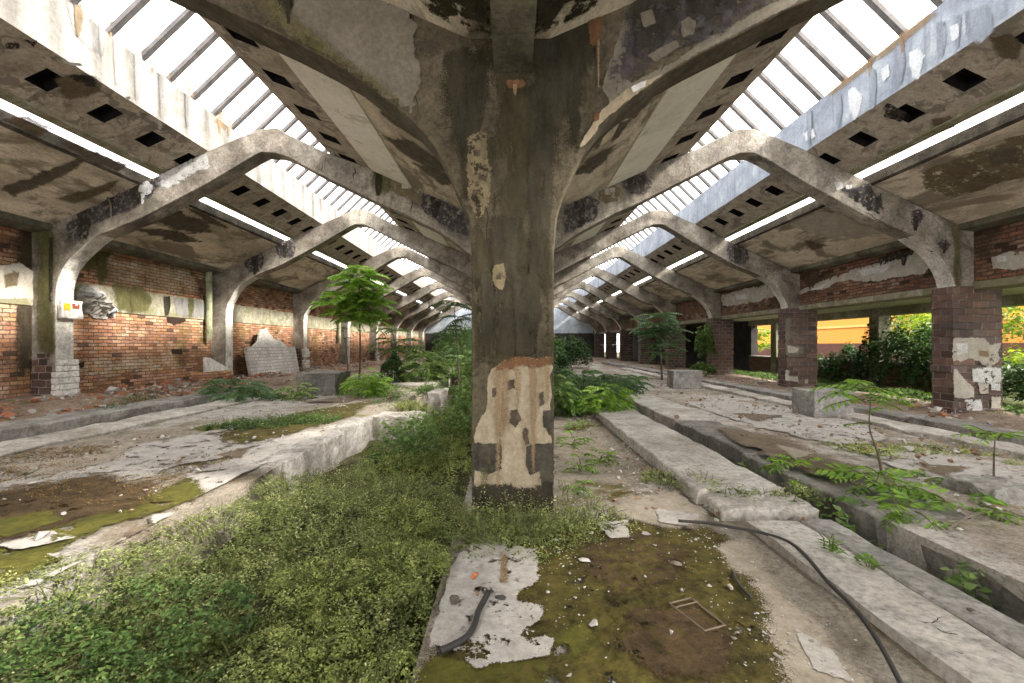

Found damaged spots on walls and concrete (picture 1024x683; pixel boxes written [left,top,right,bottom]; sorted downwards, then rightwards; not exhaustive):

rust [587,16,603,88]
peeling [580,0,798,147]
peeling [466,131,493,218]
water stain [380,0,652,375]
water stain [9,230,54,381]
peeling [492,263,506,290]
peeling [799,252,928,294]
peeling [991,251,1024,270]
peeling [952,337,1001,411]
spalling [473,356,555,507]
rust [494,356,553,486]